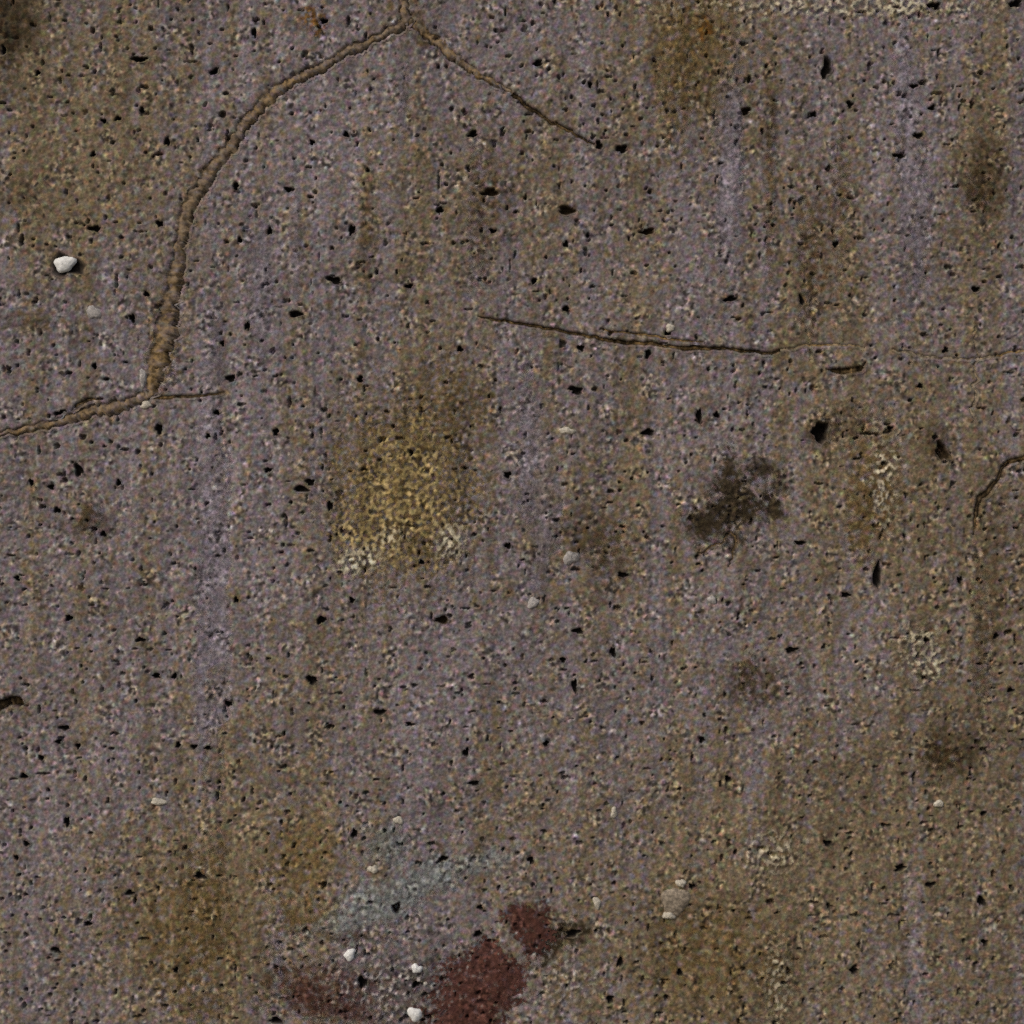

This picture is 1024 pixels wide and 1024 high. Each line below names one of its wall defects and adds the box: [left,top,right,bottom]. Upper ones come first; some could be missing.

crack [0,0,595,439]
crack [477,314,868,377]
water stain [680,443,787,550]
corrosion [279,966,379,1022]
corrosion [412,899,559,1024]